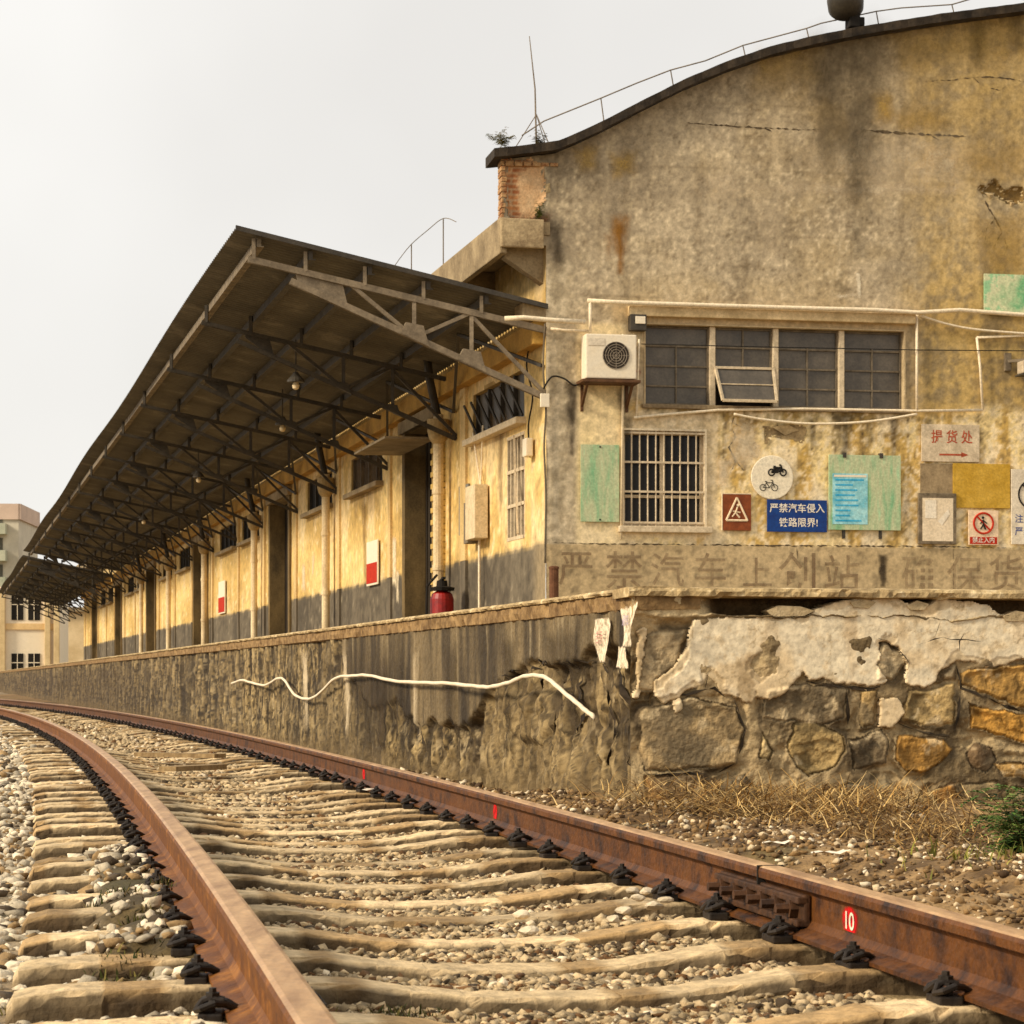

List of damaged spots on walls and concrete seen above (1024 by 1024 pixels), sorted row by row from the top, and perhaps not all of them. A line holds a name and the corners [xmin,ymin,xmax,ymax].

crack [687,122,819,131]
crack [870,130,963,140]
spalling [504,157,551,219]
spalling [978,179,1024,206]
peeling [631,599,1024,714]
peeling [876,697,905,729]